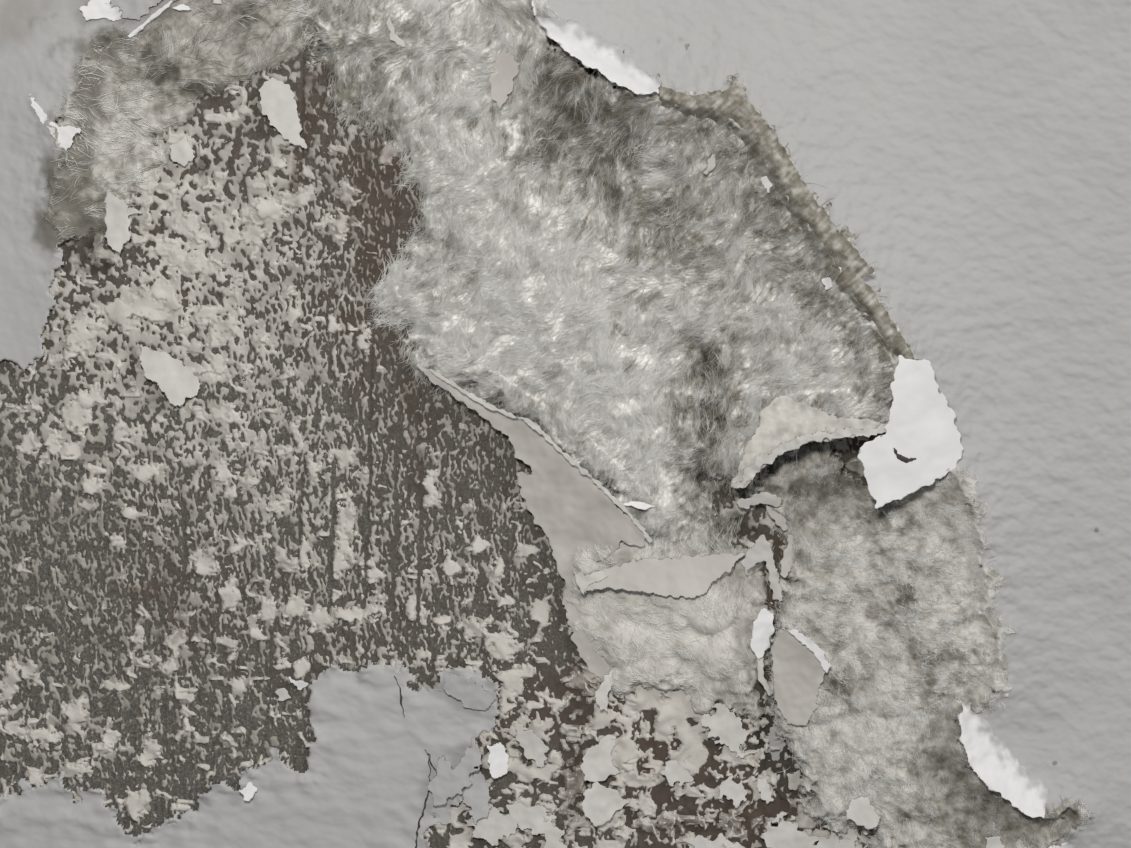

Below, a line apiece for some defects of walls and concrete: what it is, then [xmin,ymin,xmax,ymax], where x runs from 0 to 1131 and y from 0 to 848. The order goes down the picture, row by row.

peeling [0,0,876,848]
peeling [830,432,886,485]
crack [415,750,437,848]
peeling [956,702,1048,818]